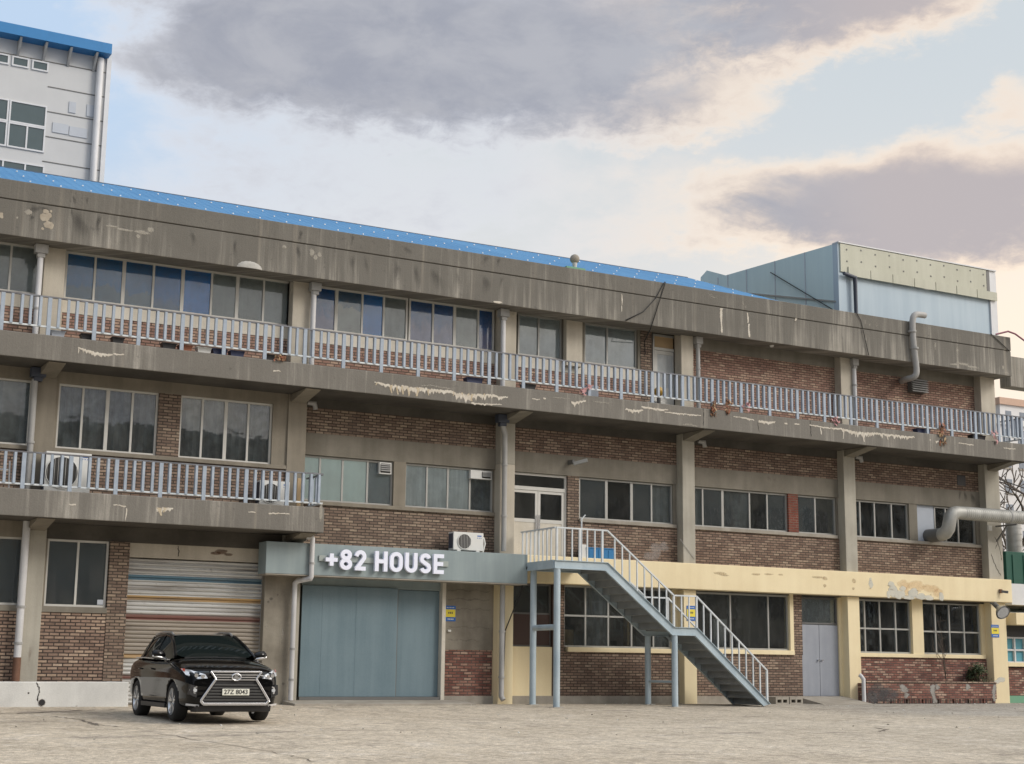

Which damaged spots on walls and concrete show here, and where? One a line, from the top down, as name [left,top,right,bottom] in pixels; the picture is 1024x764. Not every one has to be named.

spalling [16,209,54,230]
peeling [887,581,944,601]